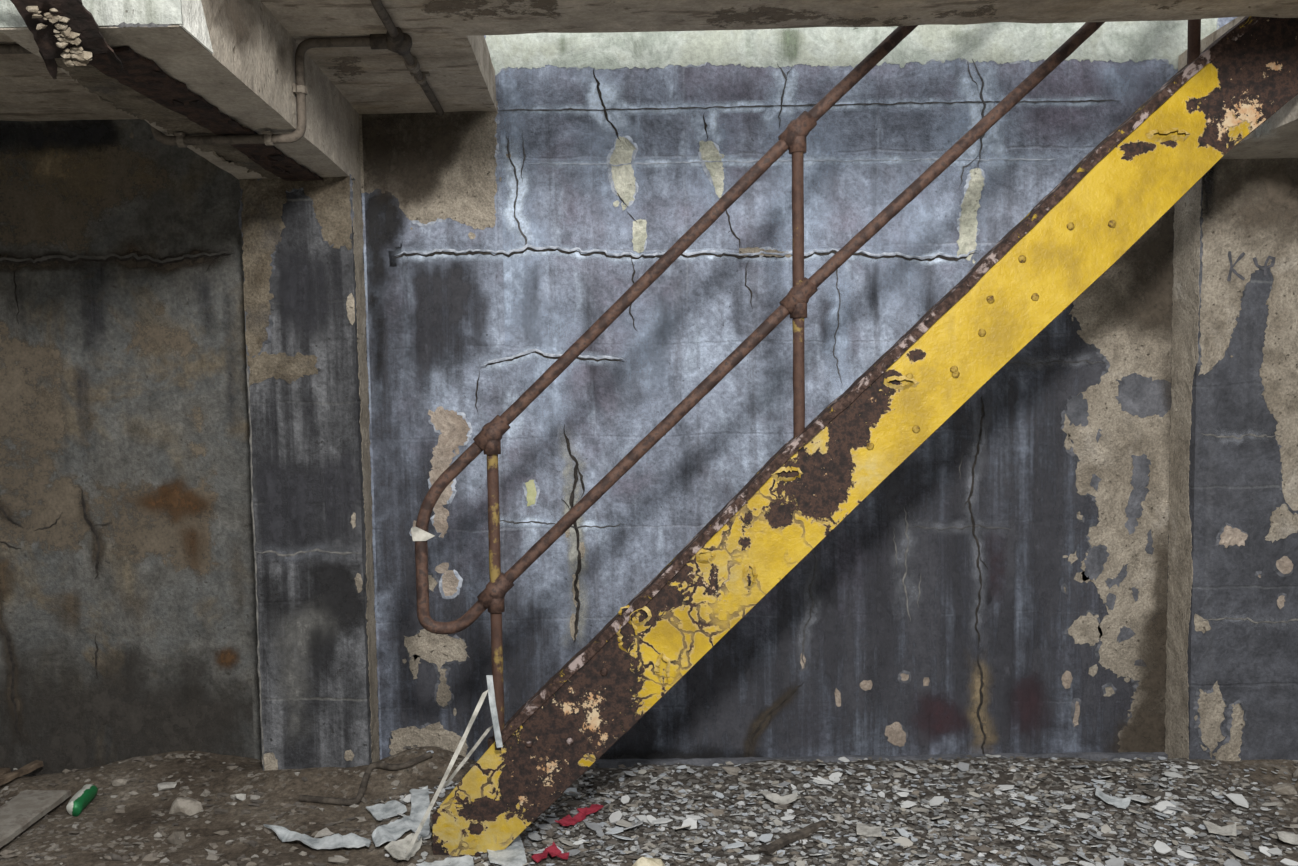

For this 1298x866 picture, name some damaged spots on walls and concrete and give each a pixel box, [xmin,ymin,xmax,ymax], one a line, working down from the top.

crack [0,249,234,324]
rust [142,481,207,520]
peeling [55,57,472,771]
leakage [257,111,558,761]
peeling [391,101,511,239]
crack [475,348,624,412]
crack [500,424,627,642]
peeling [606,135,647,253]
crack [395,59,1116,383]
crack [892,397,1011,754]
peeling [956,168,986,264]
peeling [1060,158,1298,761]